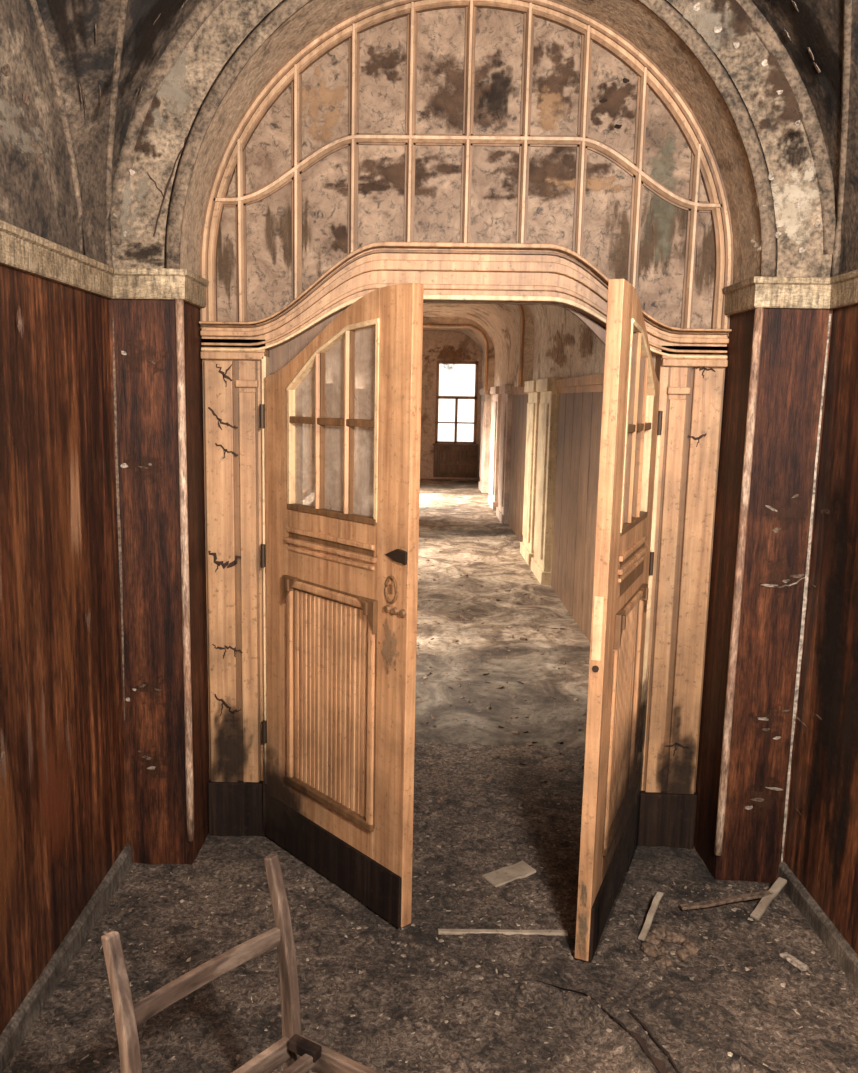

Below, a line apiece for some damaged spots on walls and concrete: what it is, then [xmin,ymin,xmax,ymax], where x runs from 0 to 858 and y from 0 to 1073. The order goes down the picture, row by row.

water stain [778,131,807,170]
water stain [121,243,162,266]
crack [208,364,238,459]
crack [208,551,241,572]
crack [212,644,243,659]
crack [215,694,241,716]
water stain [211,708,247,783]
water stain [657,707,696,794]
crack [537,980,680,1073]